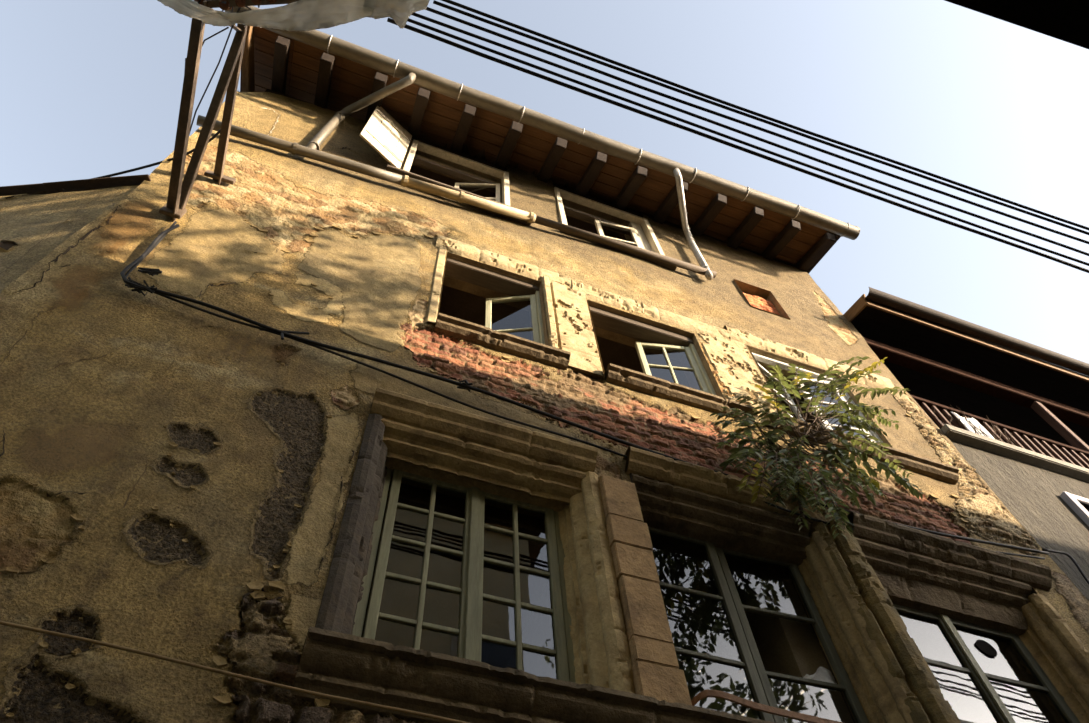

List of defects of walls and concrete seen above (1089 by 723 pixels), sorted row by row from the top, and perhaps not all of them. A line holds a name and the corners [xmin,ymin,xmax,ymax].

flaking render [182,145,451,254]
crack [0,188,128,366]
flaking render [121,506,214,570]
flaking render [150,421,223,490]
flaking render [246,385,359,581]
flaking render [399,291,973,545]
flaking render [0,604,154,723]
flaking render [283,594,322,645]